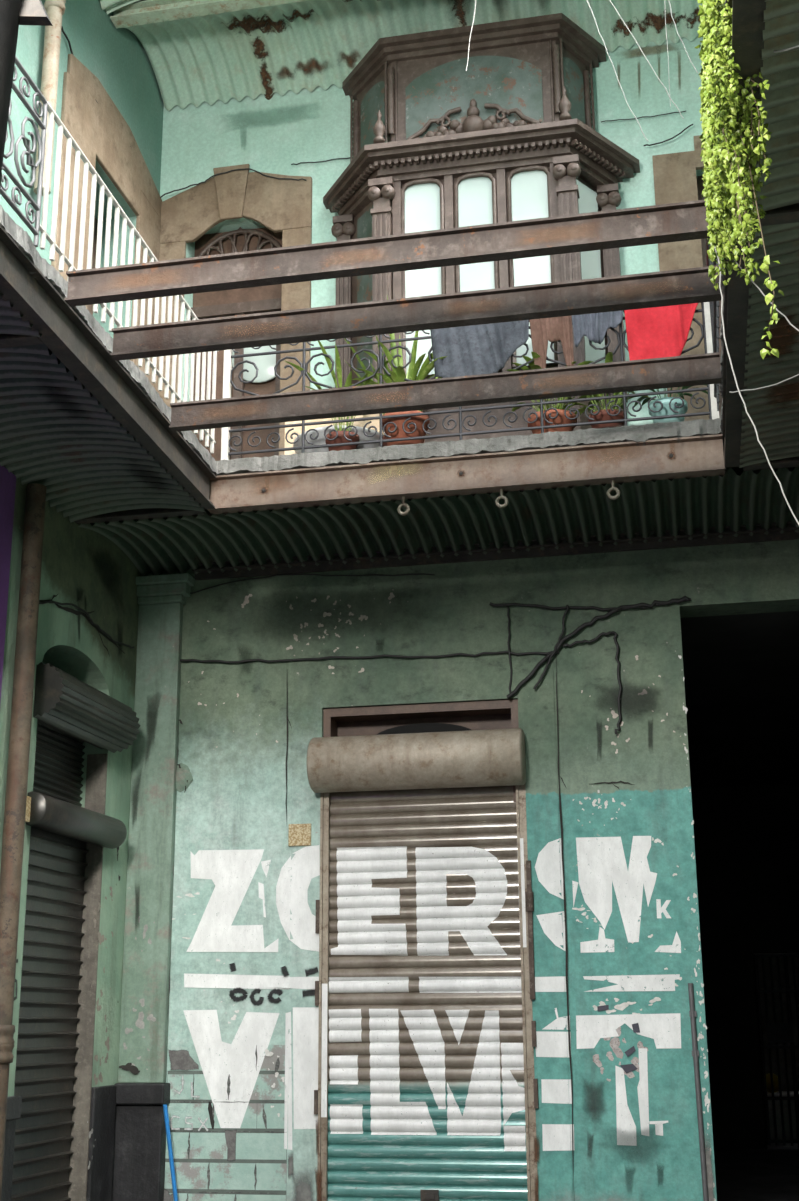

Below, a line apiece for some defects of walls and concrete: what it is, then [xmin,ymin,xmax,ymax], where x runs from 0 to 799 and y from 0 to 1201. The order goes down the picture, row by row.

corrosion [228,9,324,100]
corrosion [341,52,358,67]
peeling [286,596,368,674]
peeling [91,984,156,1085]
flaking render [164,1045,288,1201]